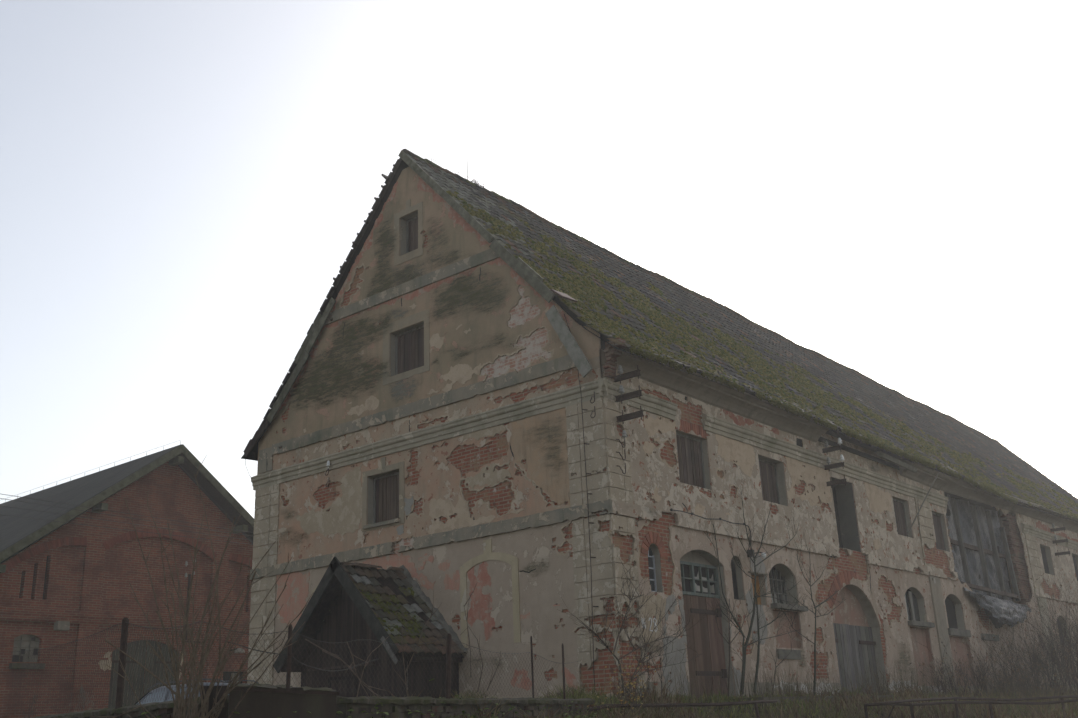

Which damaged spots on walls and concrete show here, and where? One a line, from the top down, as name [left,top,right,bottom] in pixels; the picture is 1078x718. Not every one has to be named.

peeling [277,181,398,416]
flaking render [427,286,554,396]
flaking render [487,369,582,403]
flaking render [314,481,342,511]
peeling [405,407,577,534]
flaking render [617,379,756,509]
flaking render [785,456,832,521]
peeling [353,553,436,590]
peeling [452,562,502,641]
flaking render [545,493,677,697]
flaking render [873,565,905,686]